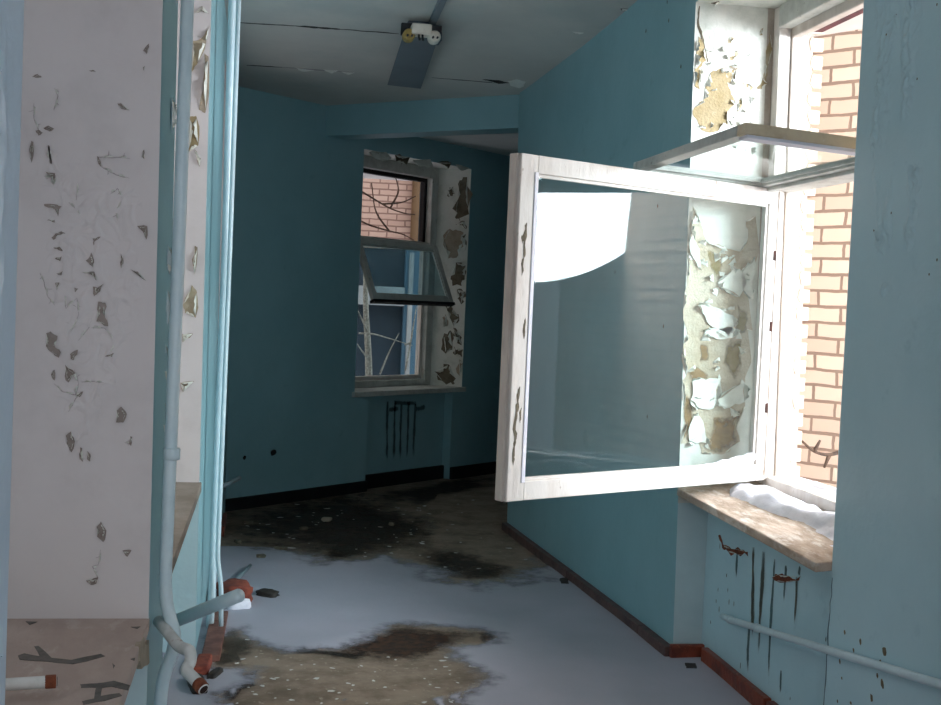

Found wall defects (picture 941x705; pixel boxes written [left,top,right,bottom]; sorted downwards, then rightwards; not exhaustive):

peeling [189,29,209,167]
peeling [693,28,772,133]
peeling [82,237,108,326]
peeling [434,161,473,384]
peeling [46,331,78,382]
peeling [681,207,759,455]
corrosion [386,401,425,456]
peeling [512,387,522,465]
water stain [229,478,485,558]
water stain [431,551,507,578]
water stain [294,628,468,659]
corrosion [740,549,801,691]